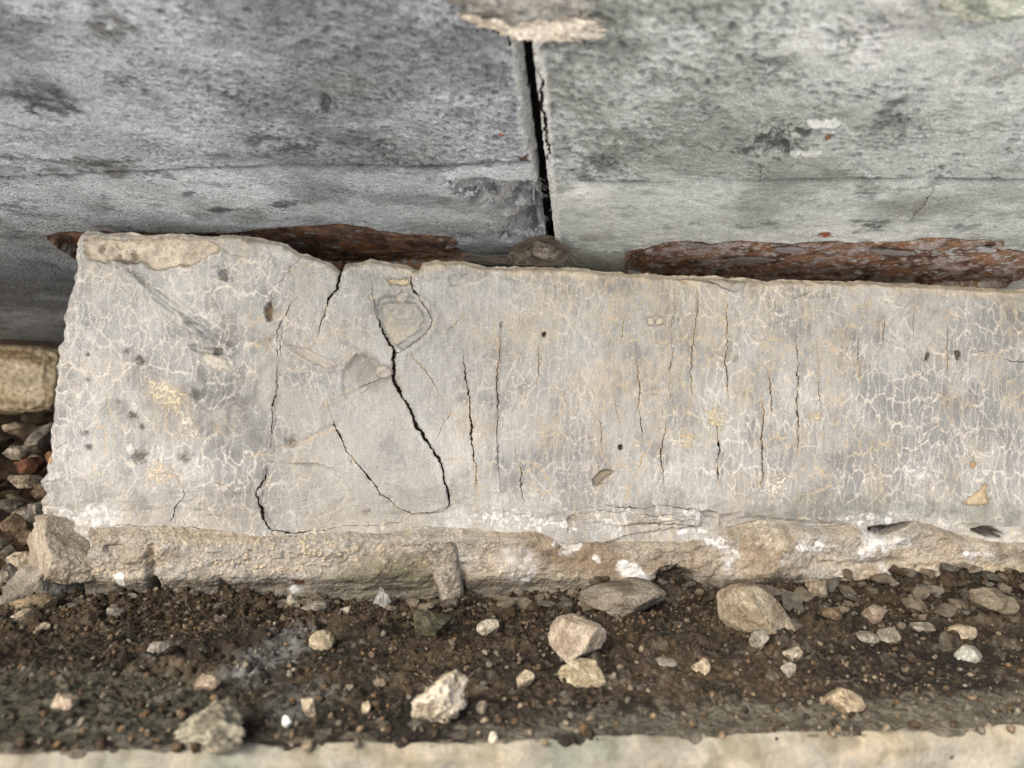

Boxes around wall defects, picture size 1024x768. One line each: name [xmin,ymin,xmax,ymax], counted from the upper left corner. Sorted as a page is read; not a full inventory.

crack [537,68,552,163]
corrosion [45,231,85,260]
corrosion [99,224,466,271]
corrosion [624,232,1024,289]
crack [163,258,560,534]
crack [538,279,735,527]
crack [760,297,822,483]